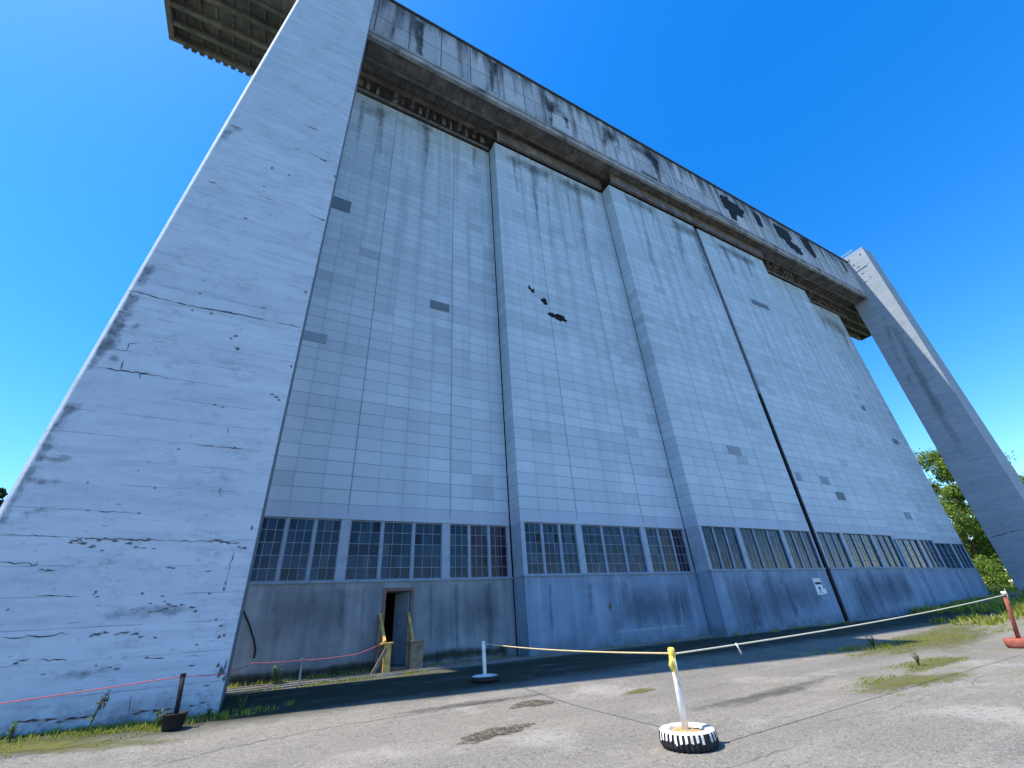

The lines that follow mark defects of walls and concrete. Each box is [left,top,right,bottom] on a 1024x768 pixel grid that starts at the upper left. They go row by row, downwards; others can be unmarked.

water stain [415,21,423,54]
peeling [720,195,816,258]
crack [128,290,302,329]
crack [96,342,173,379]
crack [10,534,239,581]
crack [5,632,70,661]